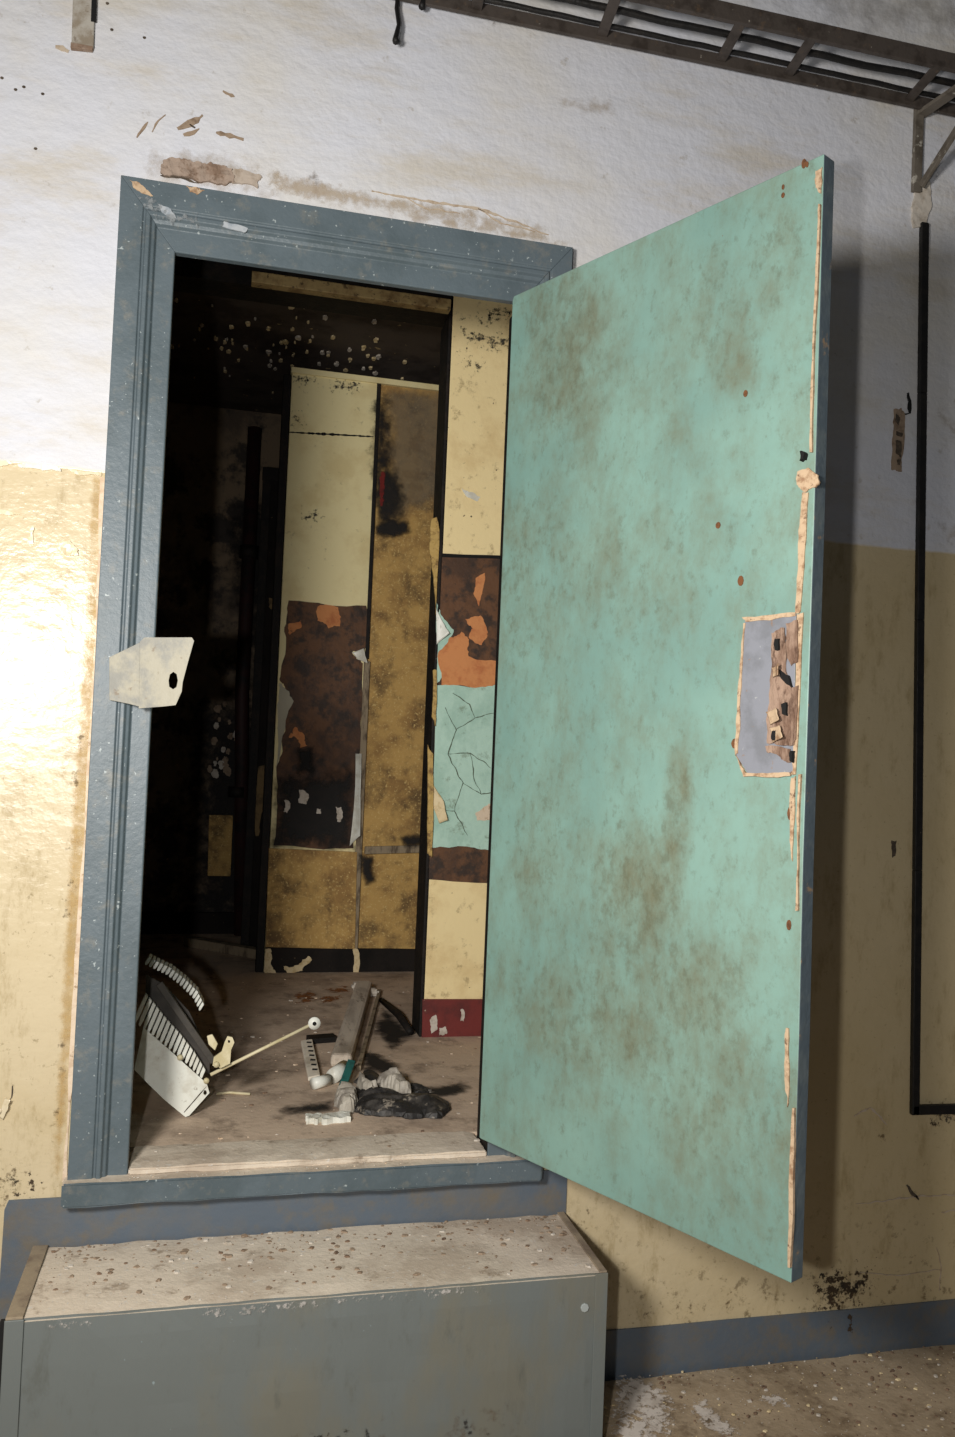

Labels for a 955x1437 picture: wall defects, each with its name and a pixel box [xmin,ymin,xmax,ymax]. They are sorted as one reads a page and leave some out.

spalling [136,115,203,138]
spalling [216,131,244,141]
spalling [130,180,197,226]
spalling [160,157,262,195]
spalling [222,221,248,233]
damp [275,174,549,238]
peeling [272,601,368,849]
peeling [429,553,500,883]
crack [445,693,493,834]
damp [815,1257,938,1332]